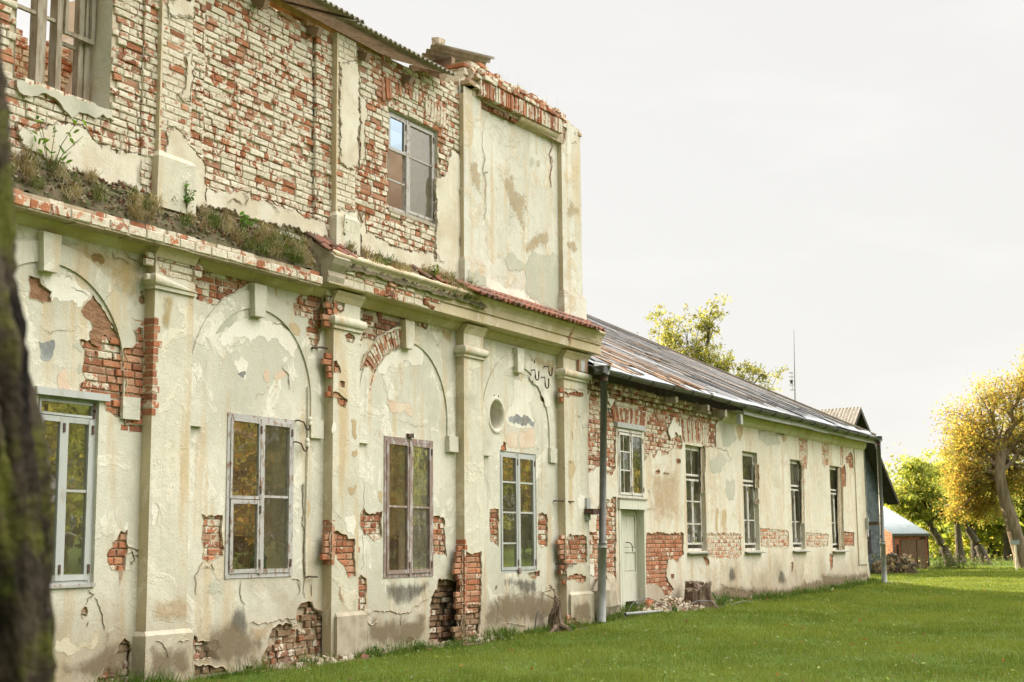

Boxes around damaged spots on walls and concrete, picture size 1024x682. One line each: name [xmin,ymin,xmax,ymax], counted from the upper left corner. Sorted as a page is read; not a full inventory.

flaking render [0,0,160,194]
flaking render [190,0,333,241]
flaking render [355,46,460,266]
crack [482,127,522,220]
spalling [28,246,251,432]
spalling [500,359,743,566]
spalling [107,522,129,572]
spalling [261,601,322,666]
spalling [319,491,383,611]
spalling [429,515,485,643]
spalling [538,493,617,584]
spalling [646,531,684,596]